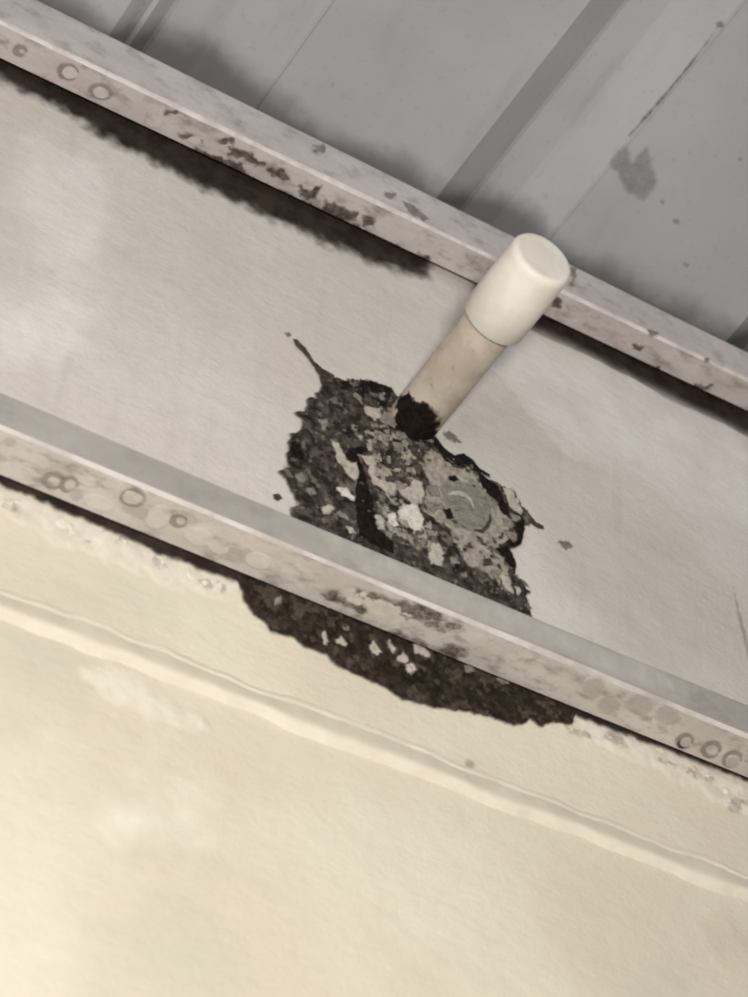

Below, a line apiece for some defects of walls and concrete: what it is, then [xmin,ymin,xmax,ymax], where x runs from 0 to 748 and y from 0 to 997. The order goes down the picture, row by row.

damp [0,45,430,383]
spalling [273,332,544,617]